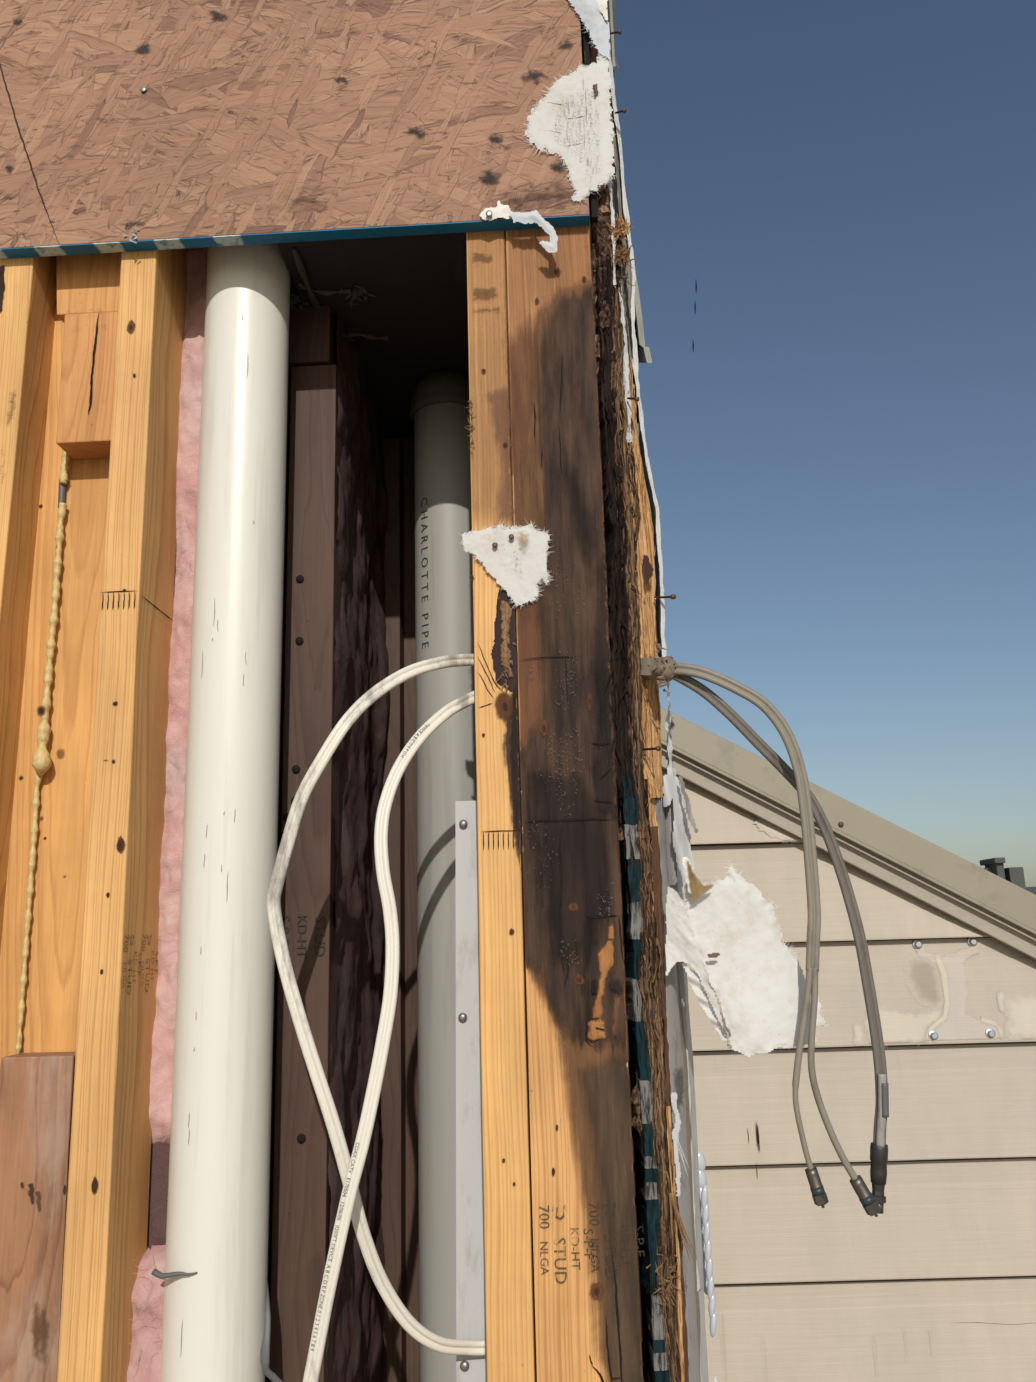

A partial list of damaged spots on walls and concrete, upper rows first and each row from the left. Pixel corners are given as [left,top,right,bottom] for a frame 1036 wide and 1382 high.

leakage [491,225,643,1382]